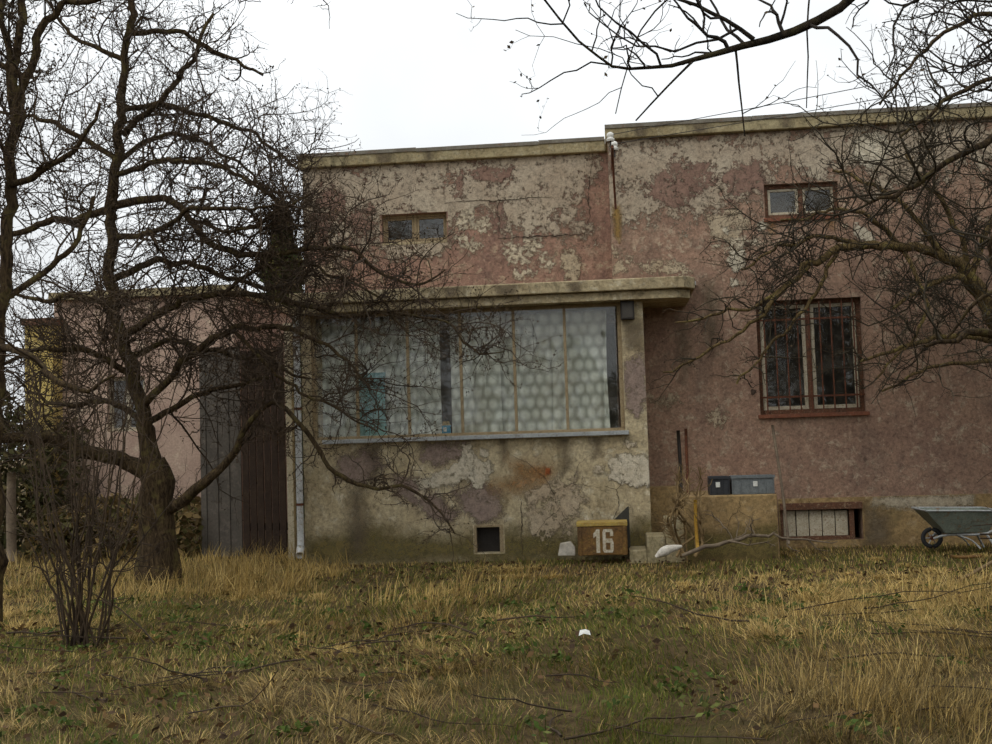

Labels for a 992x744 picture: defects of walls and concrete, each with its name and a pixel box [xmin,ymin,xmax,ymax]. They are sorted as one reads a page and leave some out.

peeling [302,119,992,288]
peeling [411,443,495,502]
peeling [518,463,591,546]
peeling [592,438,650,489]